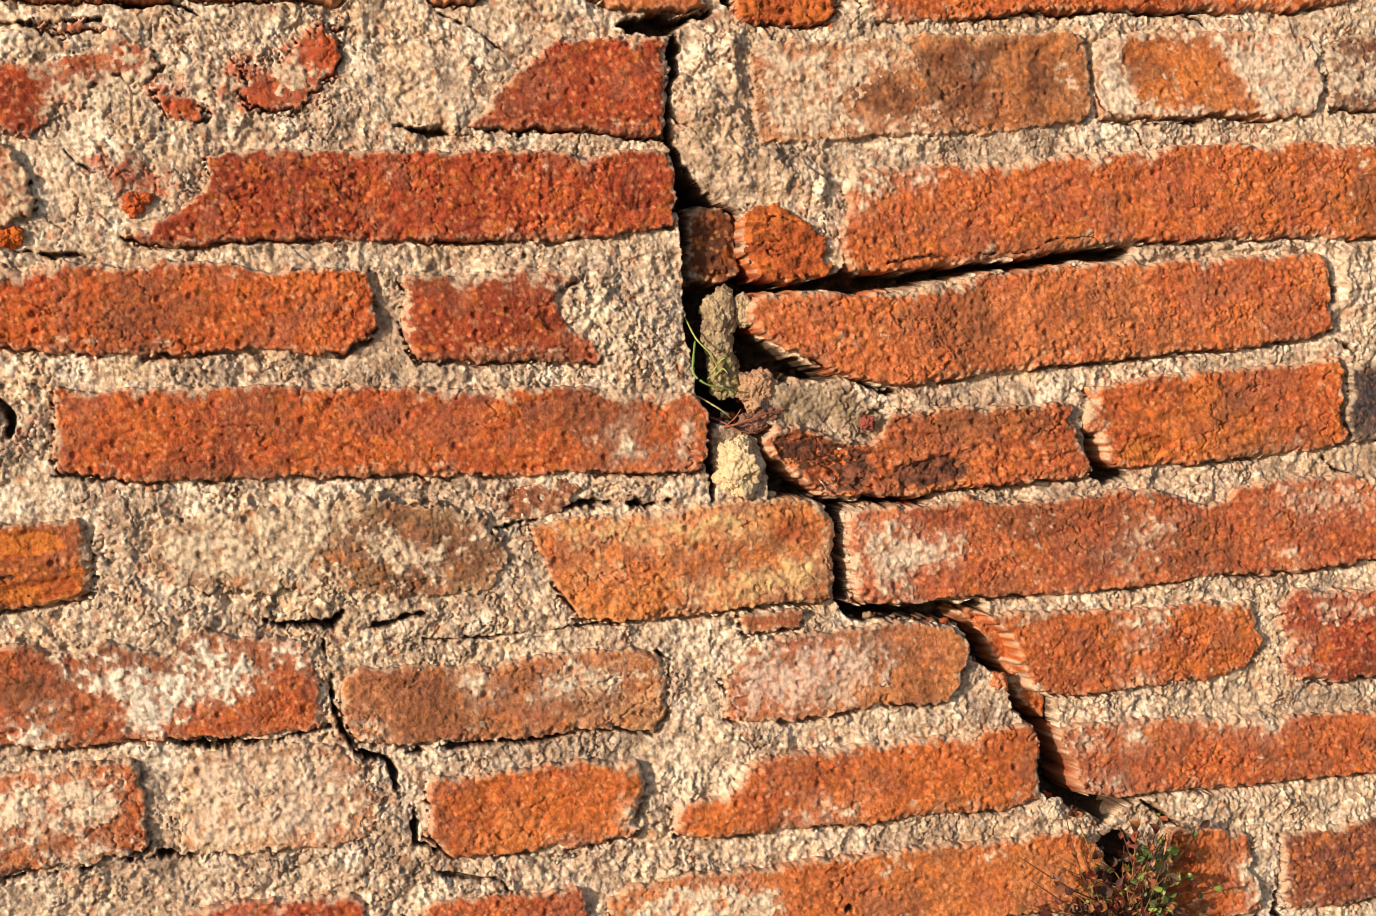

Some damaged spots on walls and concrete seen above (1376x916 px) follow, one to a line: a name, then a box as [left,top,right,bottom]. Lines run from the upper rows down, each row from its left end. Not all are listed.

crack [876,10,1277,28]
crack [393,122,591,139]
crack [1122,113,1270,146]
crack [494,0,1132,670]
crack [655,649,671,677]
crack [178,608,621,892]
crack [1010,691,1178,897]